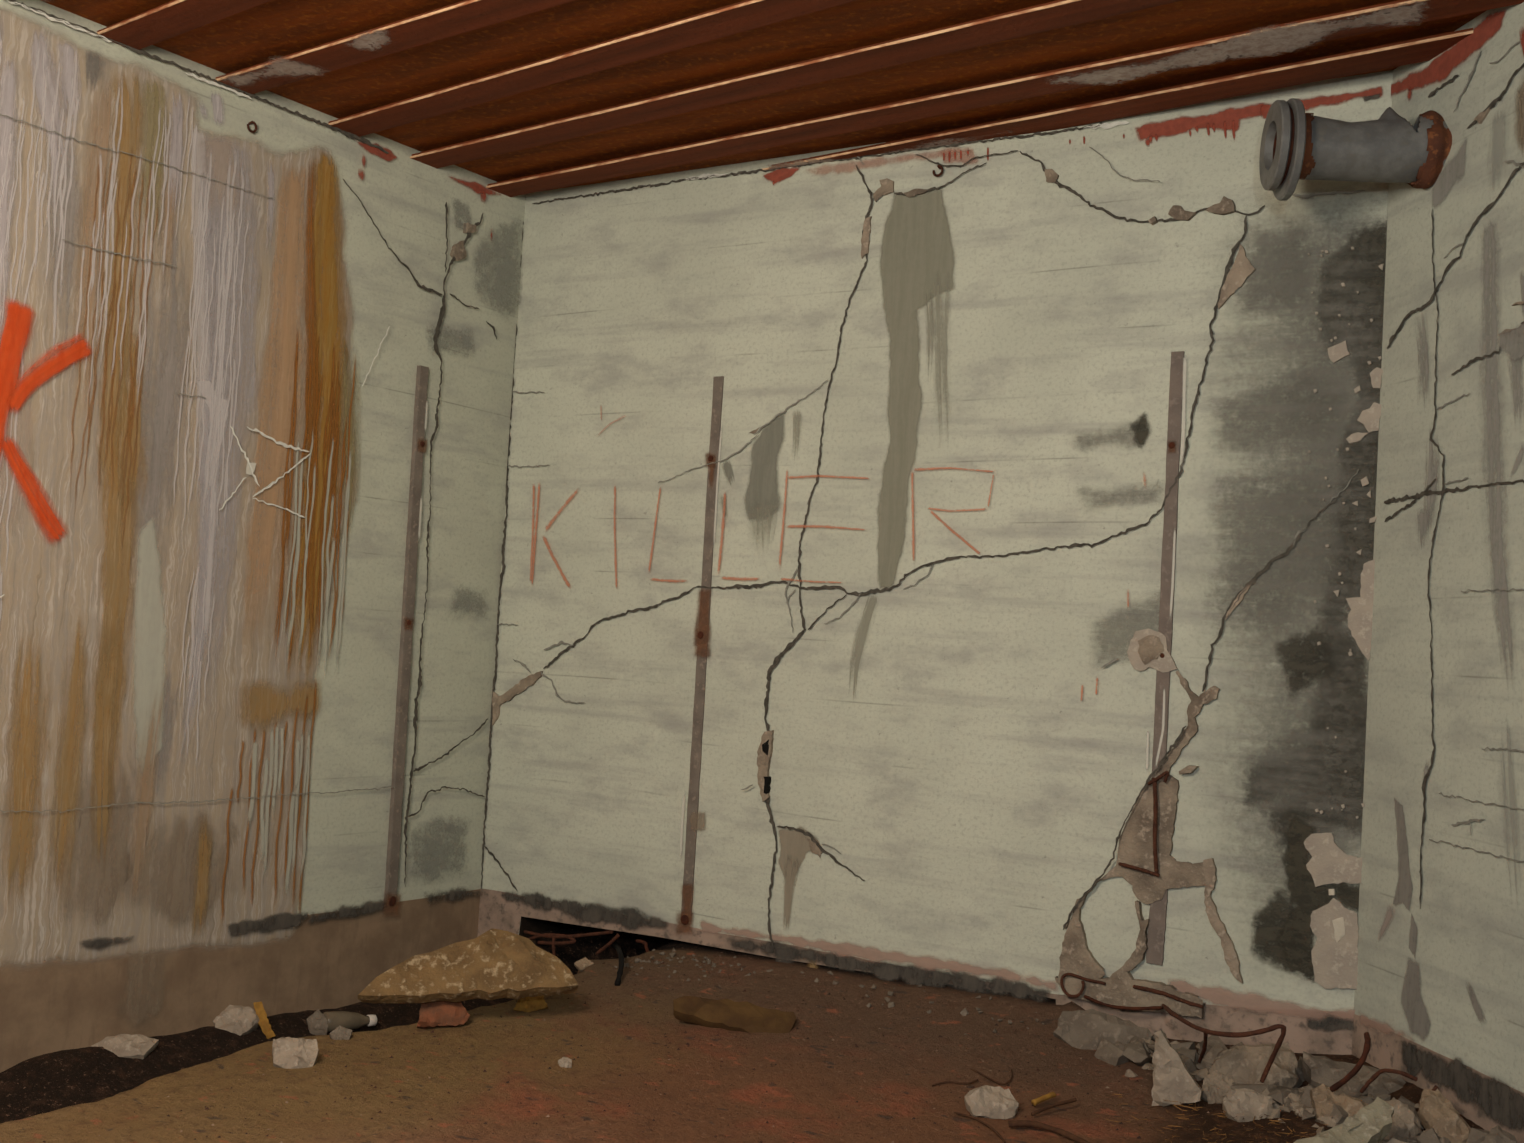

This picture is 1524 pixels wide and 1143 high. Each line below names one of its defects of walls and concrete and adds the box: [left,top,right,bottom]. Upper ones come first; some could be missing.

corrosion [8,78,177,889]
corrosion [194,154,356,930]
damp [850,190,954,689]
crack [520,121,1365,946]
damp [1224,224,1387,980]
corrosion [1299,113,1316,180]
peeling [1315,312,1351,363]
peeling [1334,549,1375,661]
peeling [1336,356,1383,451]
peeling [1342,476,1377,530]
crack [1384,160,1524,908]
spalling [1055,628,1286,1083]